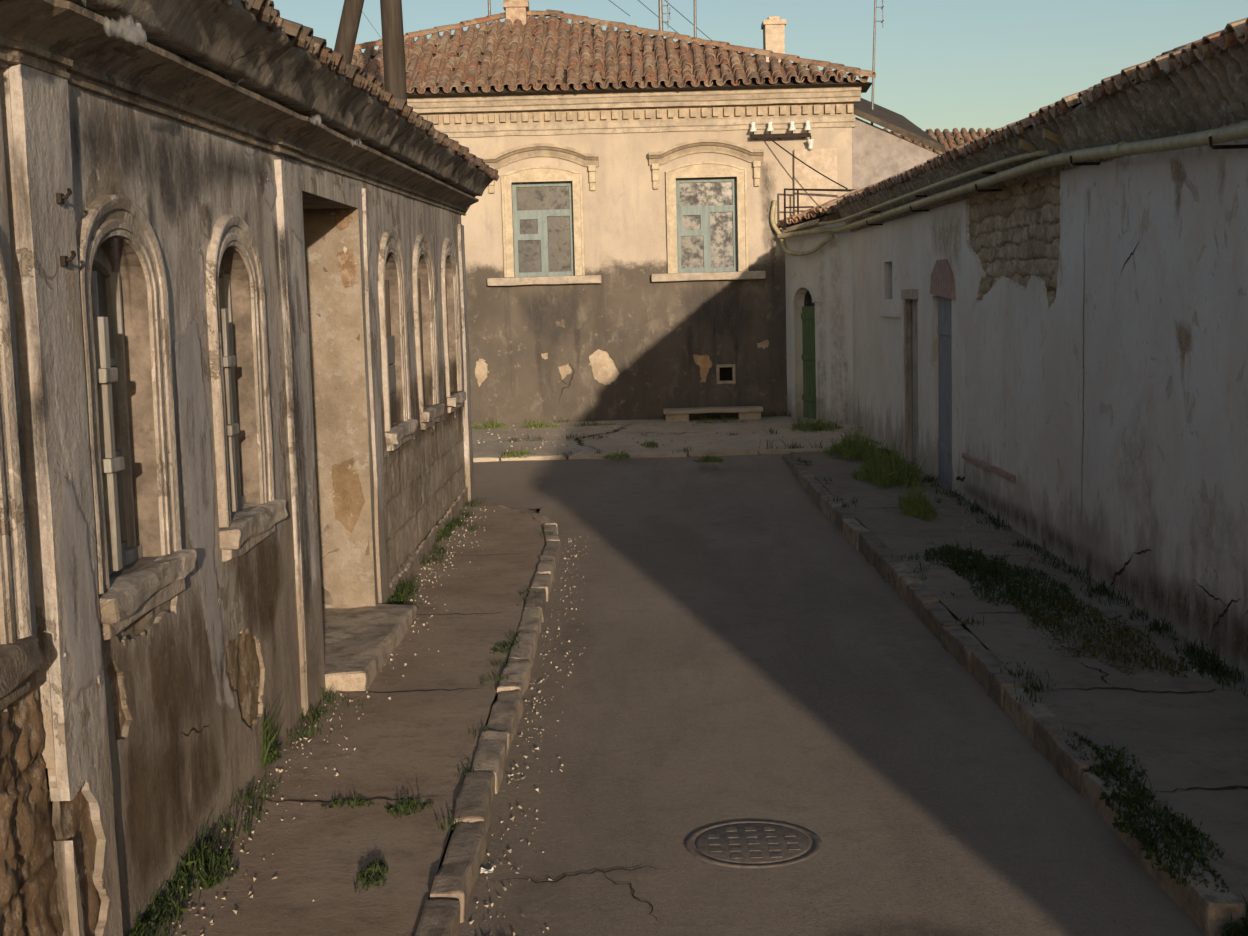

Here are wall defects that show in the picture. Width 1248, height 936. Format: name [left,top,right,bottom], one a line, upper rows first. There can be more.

damp [149,135,264,226]
spalling [969,172,1060,307]
damp [29,303,45,493]
spalling [541,353,572,379]
spalling [589,349,620,385]
spalling [692,354,713,382]
spalling [0,672,105,936]